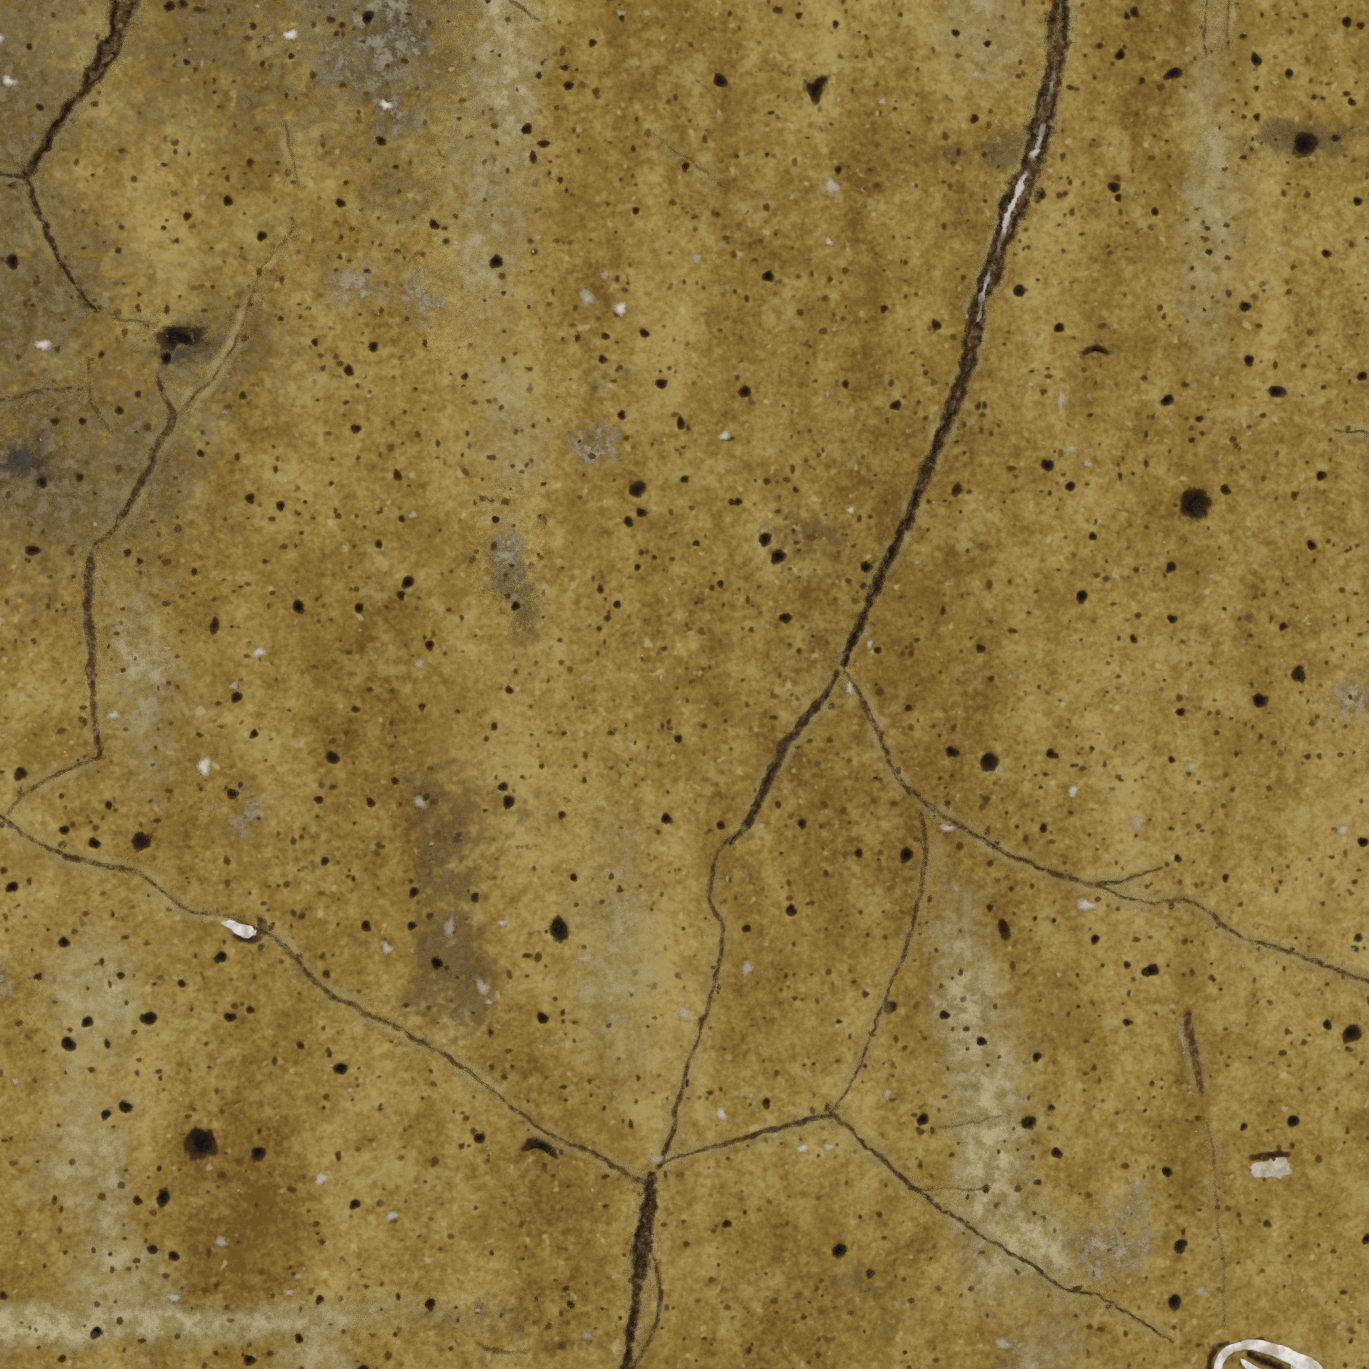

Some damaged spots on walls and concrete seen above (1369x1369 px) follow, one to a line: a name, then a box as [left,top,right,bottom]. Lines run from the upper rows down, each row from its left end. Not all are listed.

crack [0,0,143,323]
crack [279,121,292,164]
crack [265,254,278,269]
crack [0,359,113,434]
crack [28,310,245,792]
crack [693,0,1369,1050]
crack [0,815,21,834]
crack [1179,1011,1204,1096]
crack [33,833,1173,1369]